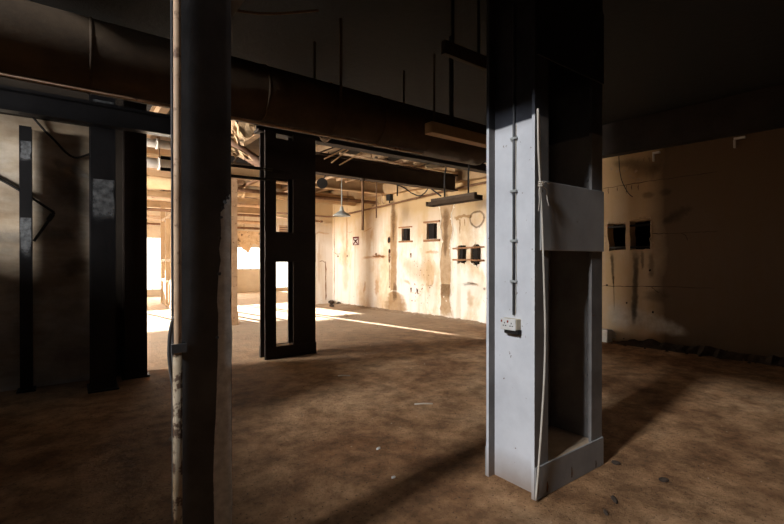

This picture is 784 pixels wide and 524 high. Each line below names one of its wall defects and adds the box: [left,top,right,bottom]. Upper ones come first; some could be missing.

leakage [363,195,439,312]
leakage [602,254,696,339]